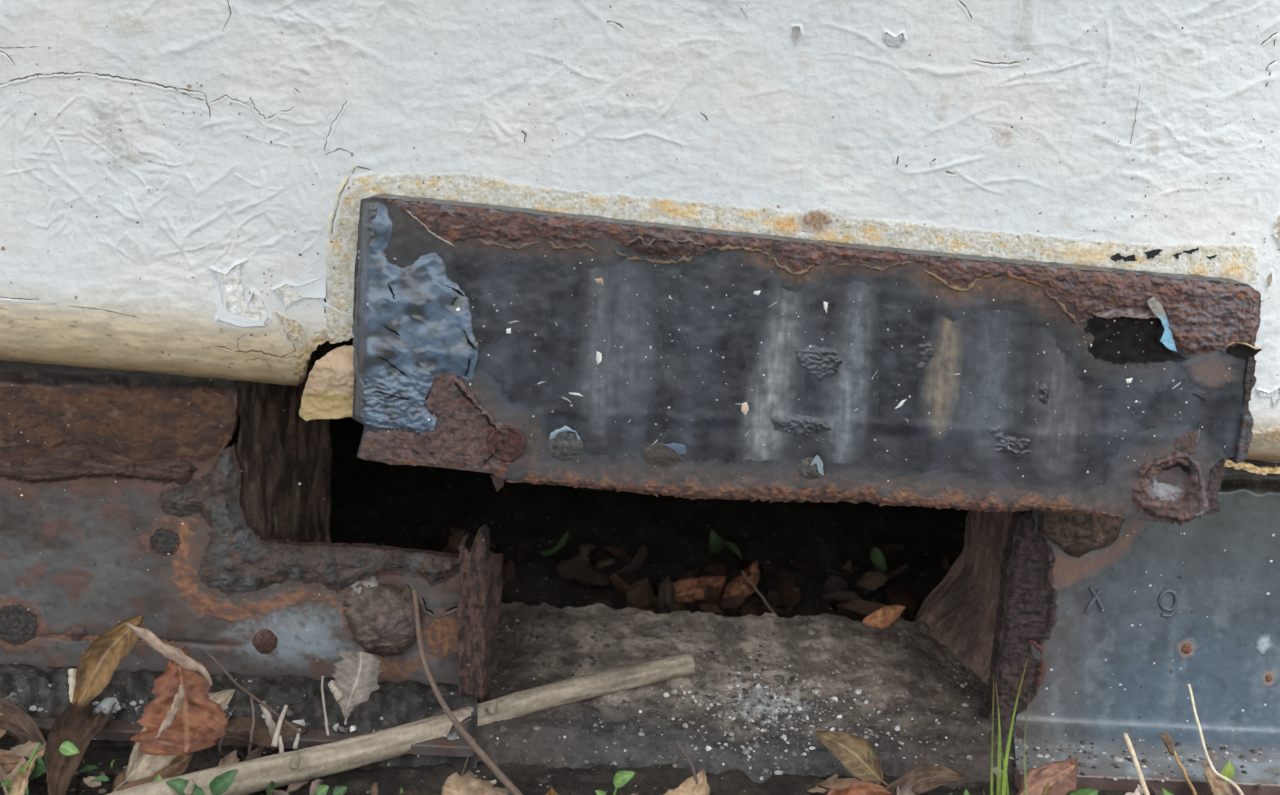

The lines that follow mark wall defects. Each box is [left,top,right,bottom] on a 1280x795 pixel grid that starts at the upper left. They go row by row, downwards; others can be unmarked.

crack [0,46,300,132]
crack [0,297,139,318]
crack [215,335,296,368]
crack [320,101,371,405]
peeling [207,171,1280,347]
corrosion [386,198,1280,515]
peeling [1054,296,1190,393]
corrosion [0,384,460,683]
corrosion [358,370,1150,743]
corrosion [1175,636,1201,661]